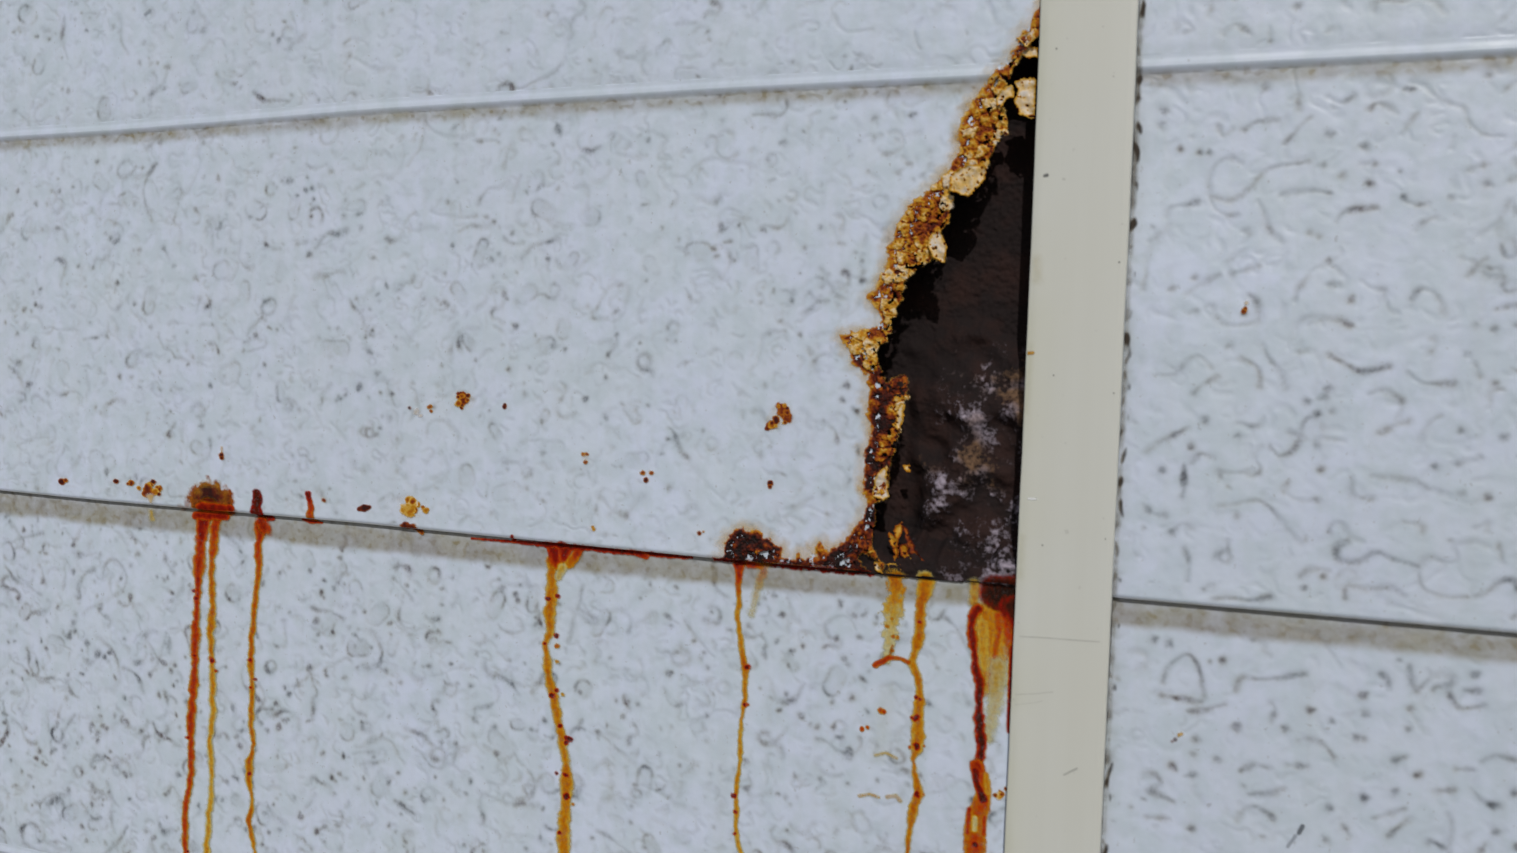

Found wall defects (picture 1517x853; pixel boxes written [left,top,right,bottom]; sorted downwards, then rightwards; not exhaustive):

peeling [1016,28,1039,59]
peeling [996,77,1037,119]
peeling [949,164,987,197]
peeling [928,230,947,263]
corrosion [712,8,1040,853]
peeling [895,403,905,432]
peeling [872,464,911,501]
peeling [874,522,925,574]
corrosion [181,476,275,853]
corrosion [471,526,693,853]